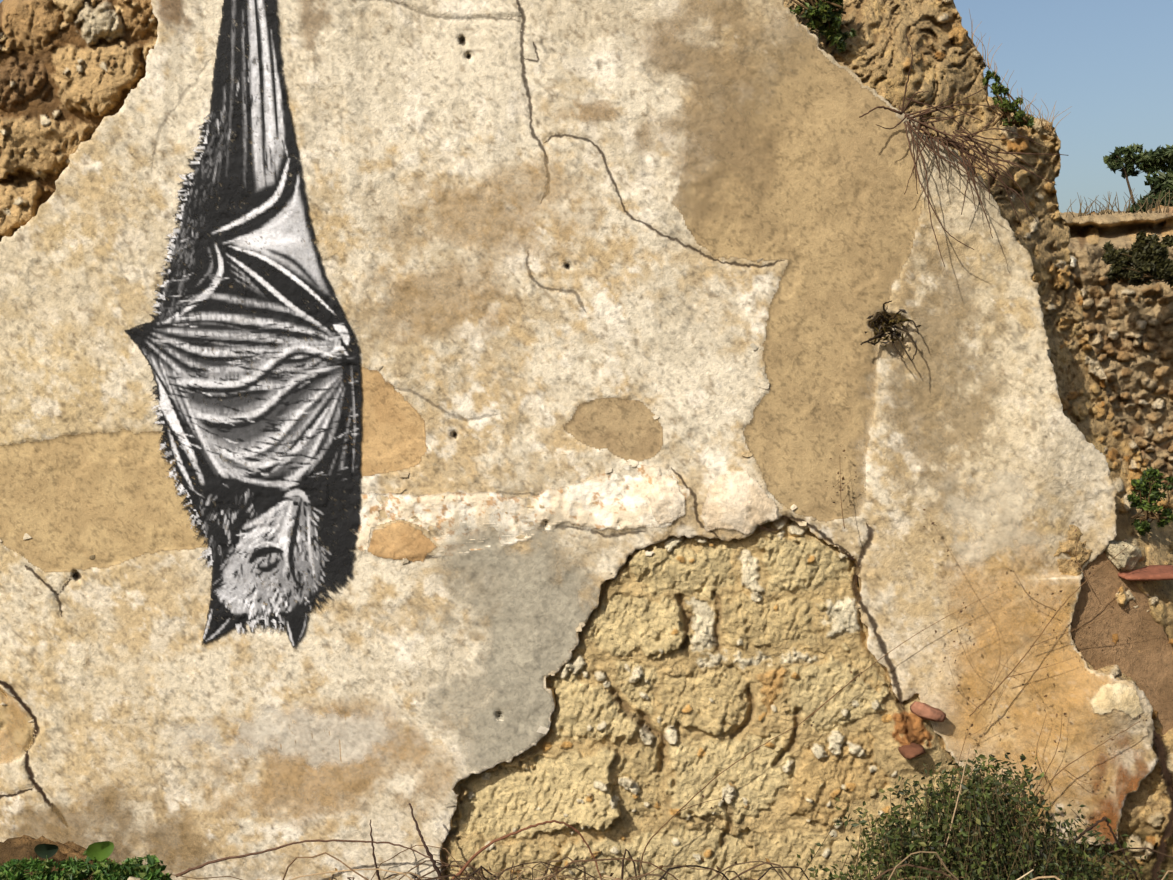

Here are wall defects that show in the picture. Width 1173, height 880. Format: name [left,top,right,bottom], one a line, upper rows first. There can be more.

crack [516,0,785,267]
peeling [0,429,208,573]
flaking render [341,35,976,880]
crack [757,515,904,709]
crack [0,681,58,810]